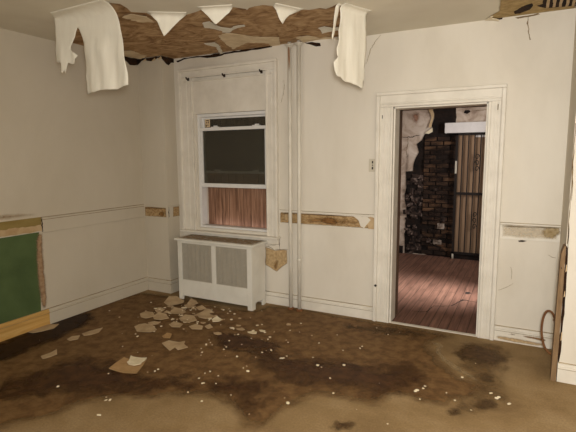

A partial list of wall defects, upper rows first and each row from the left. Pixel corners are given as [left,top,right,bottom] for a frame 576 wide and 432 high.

peeling [124,21,280,65]
peeling [296,26,339,46]
flaking render [403,108,457,257]
peeling [145,206,179,217]
peeling [280,212,374,229]
peeling [0,216,46,324]
flaking render [265,239,288,271]
flaking render [29,324,59,333]
leakage [0,293,507,426]